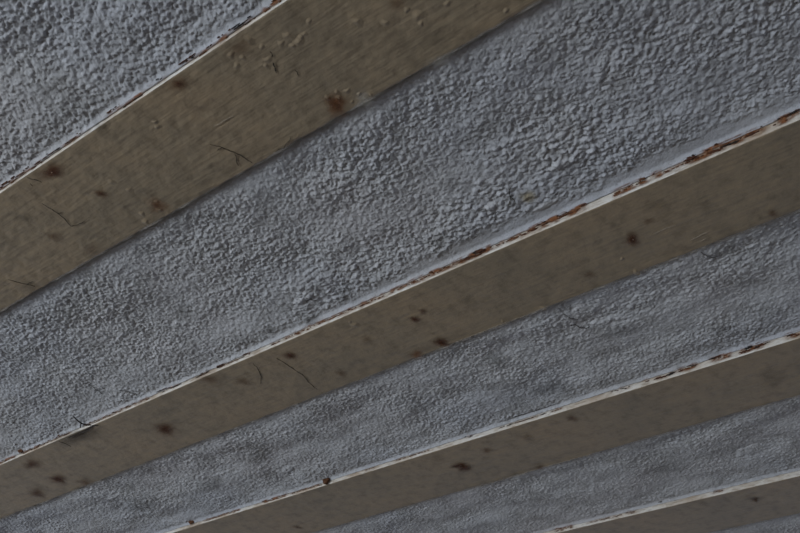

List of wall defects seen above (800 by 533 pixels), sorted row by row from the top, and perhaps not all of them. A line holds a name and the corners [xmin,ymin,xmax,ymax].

corrosion [178,16,256,65]
corrosion [774,108,800,126]
corrosion [613,126,762,196]
corrosion [708,341,771,361]